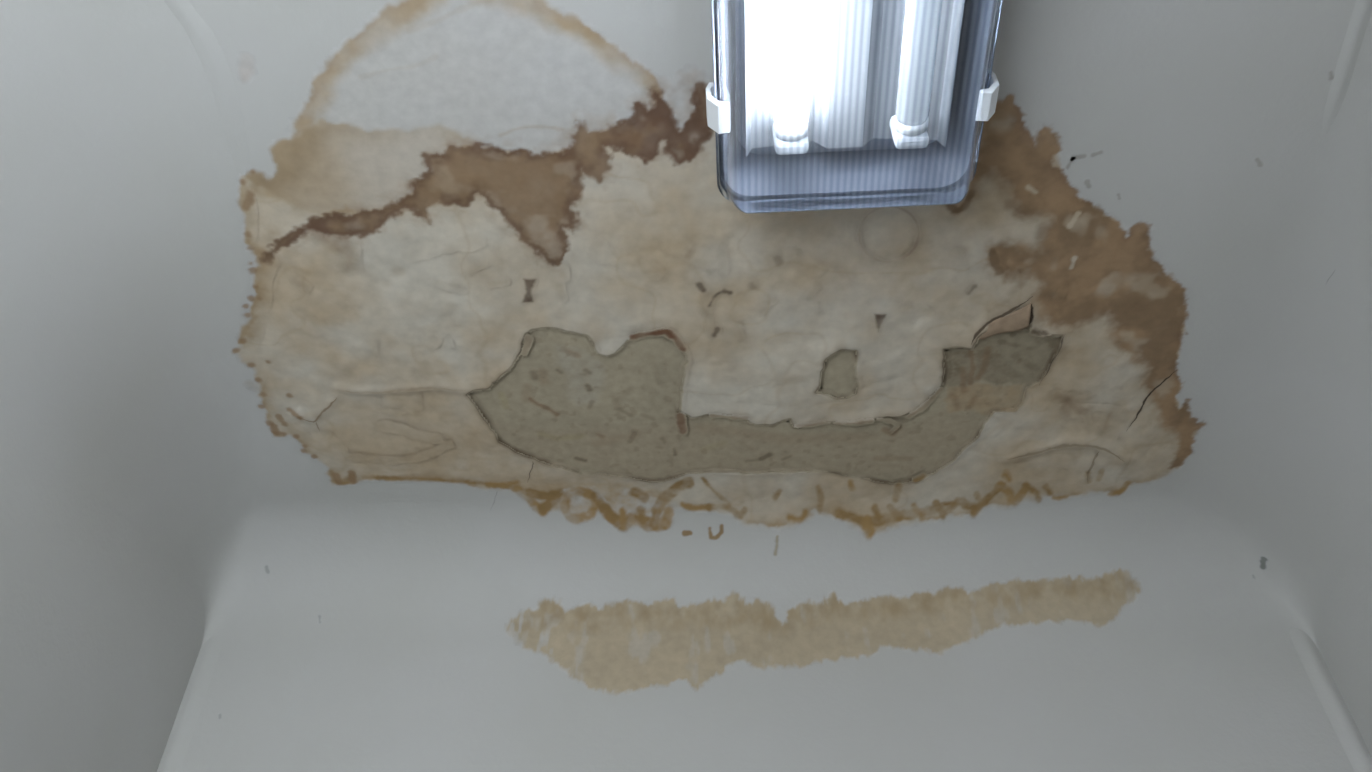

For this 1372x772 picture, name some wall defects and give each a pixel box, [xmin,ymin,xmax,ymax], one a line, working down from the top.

damp [229,0,1209,557]
peeling [462,296,1068,487]
crack [1127,372,1174,430]
damp [503,566,1144,697]